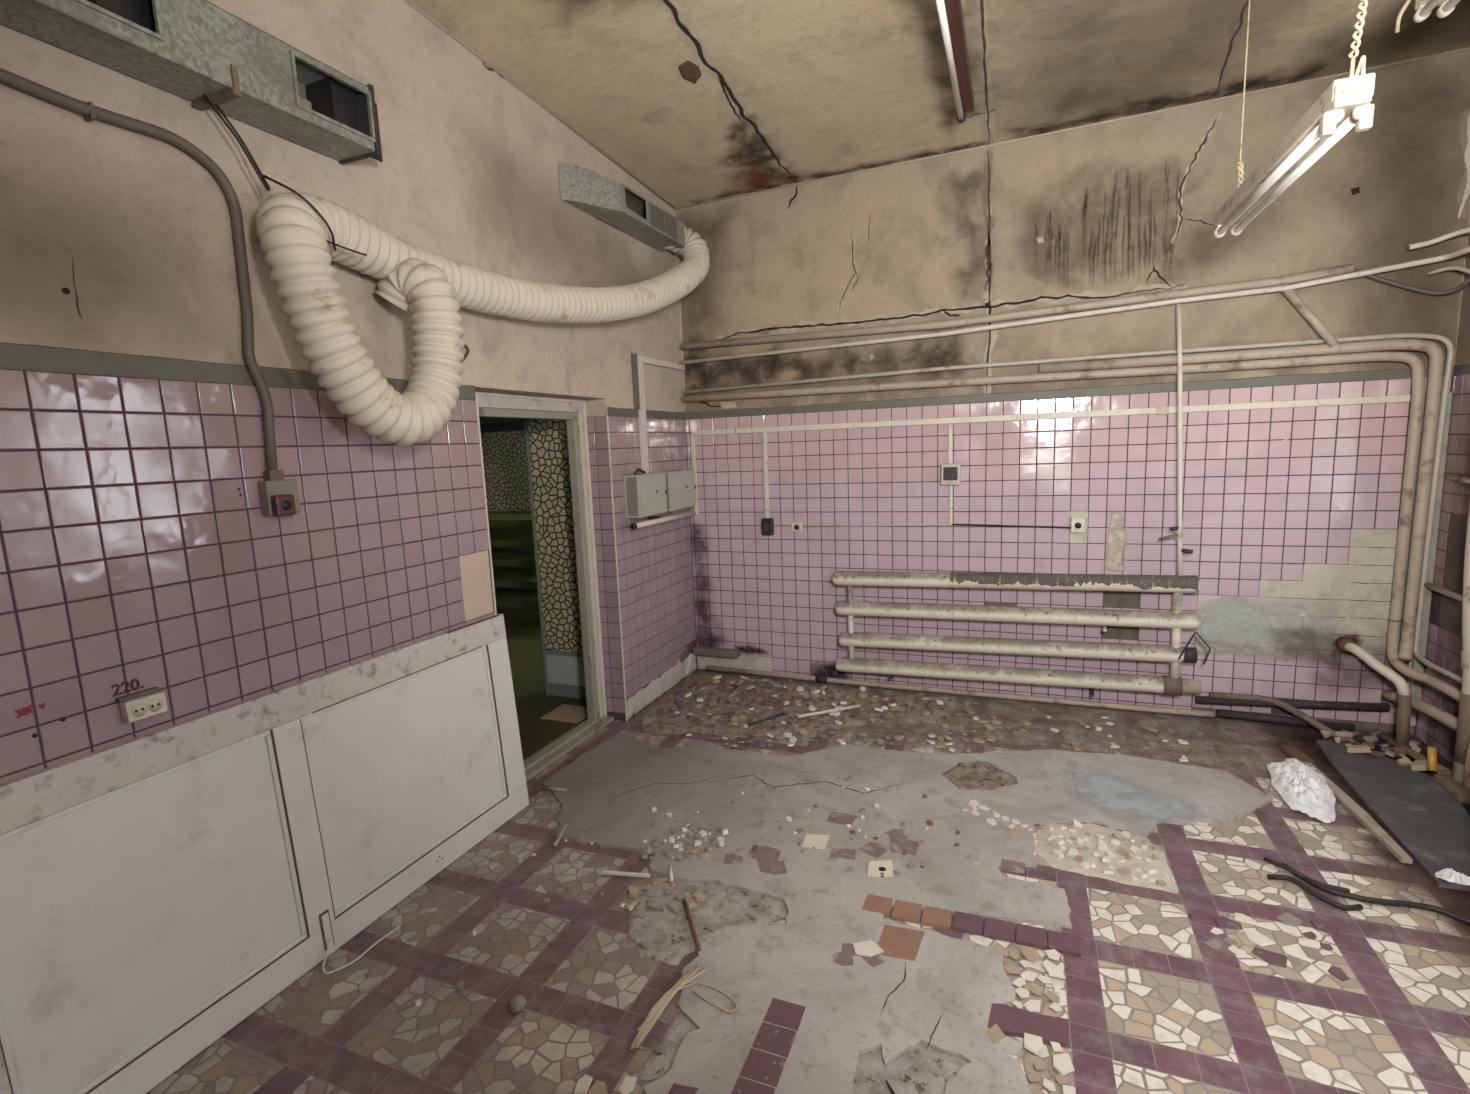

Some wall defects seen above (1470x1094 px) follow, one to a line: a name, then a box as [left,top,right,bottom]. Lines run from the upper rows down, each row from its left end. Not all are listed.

crack [657,0,803,209]
crack [704,0,1253,394]
water stain [685,349,858,389]
water stain [886,348,960,372]
peeling [947,529,1412,664]
spalling [627,646,773,719]
crack [605,775,904,800]
flaking render [842,776,879,840]
spalling [926,734,1017,790]
spalling [625,879,787,966]
spalling [630,1008,698,1093]
spalling [852,1043,968,1094]